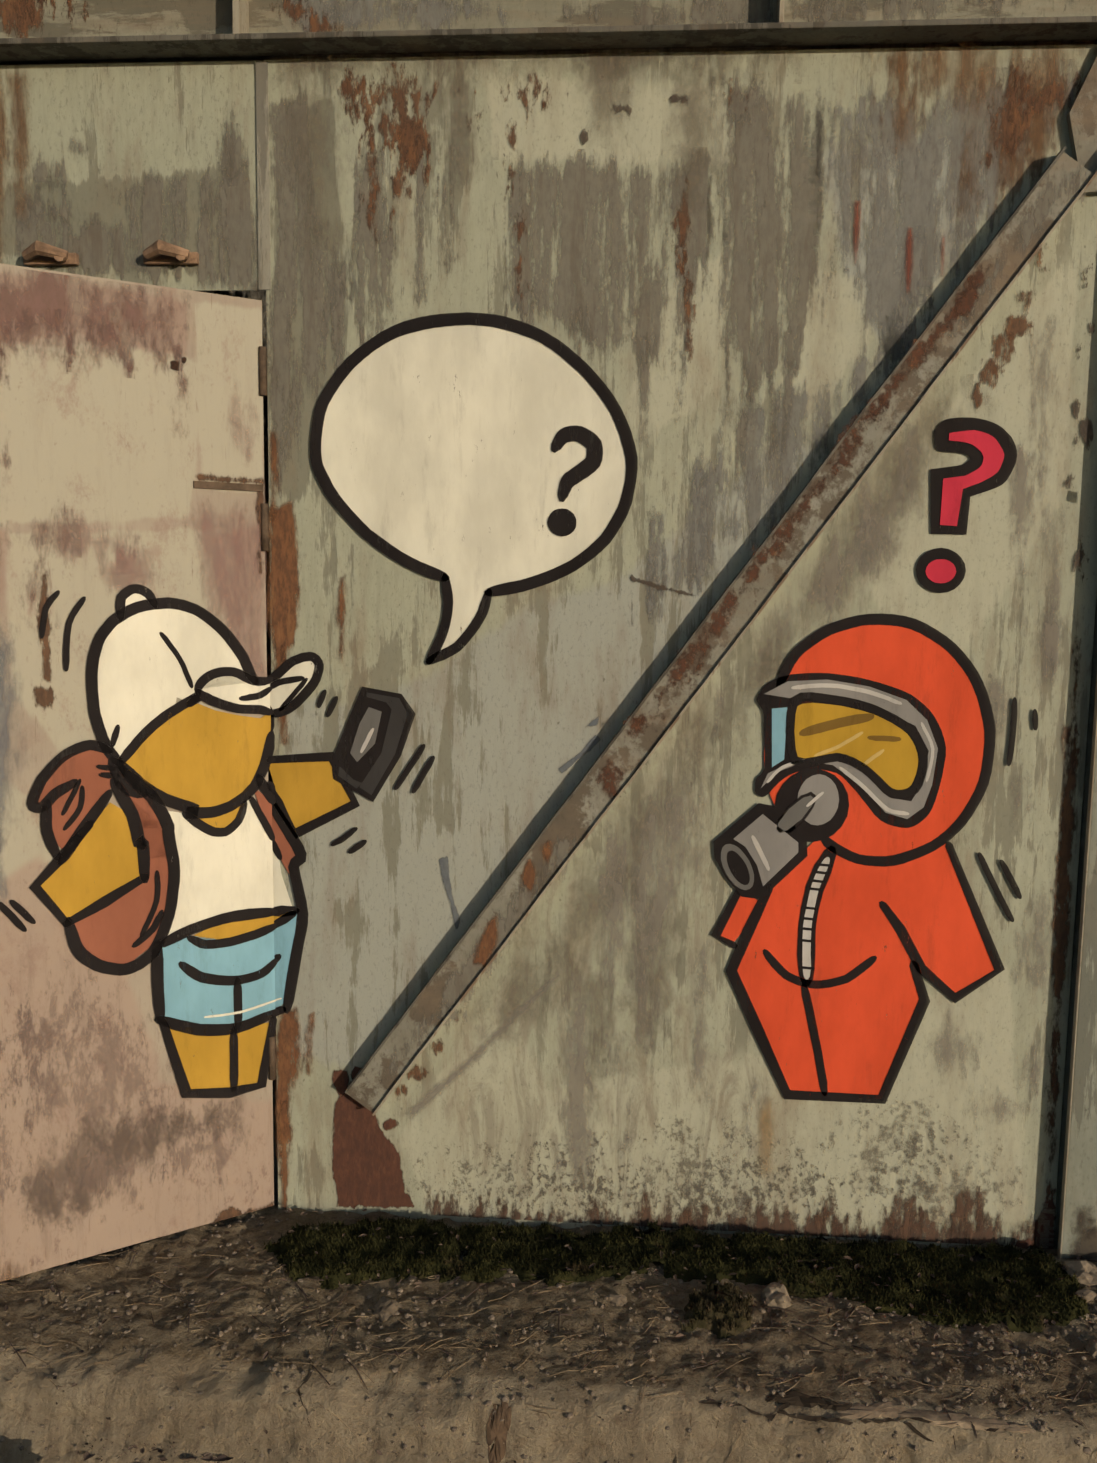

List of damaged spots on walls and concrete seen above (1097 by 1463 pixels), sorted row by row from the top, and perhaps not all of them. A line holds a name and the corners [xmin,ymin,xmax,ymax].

rust [0,0,101,38]
rust [338,63,481,242]
rust [980,60,1081,168]
rust [973,291,1034,408]
rust [197,433,300,670]
rust [336,578,346,657]
rust [623,267,989,736]
rust [597,760,624,799]
rust [1045,637,1080,1162]
rust [214,1008,314,1222]
peeling [444,1100,1021,1241]